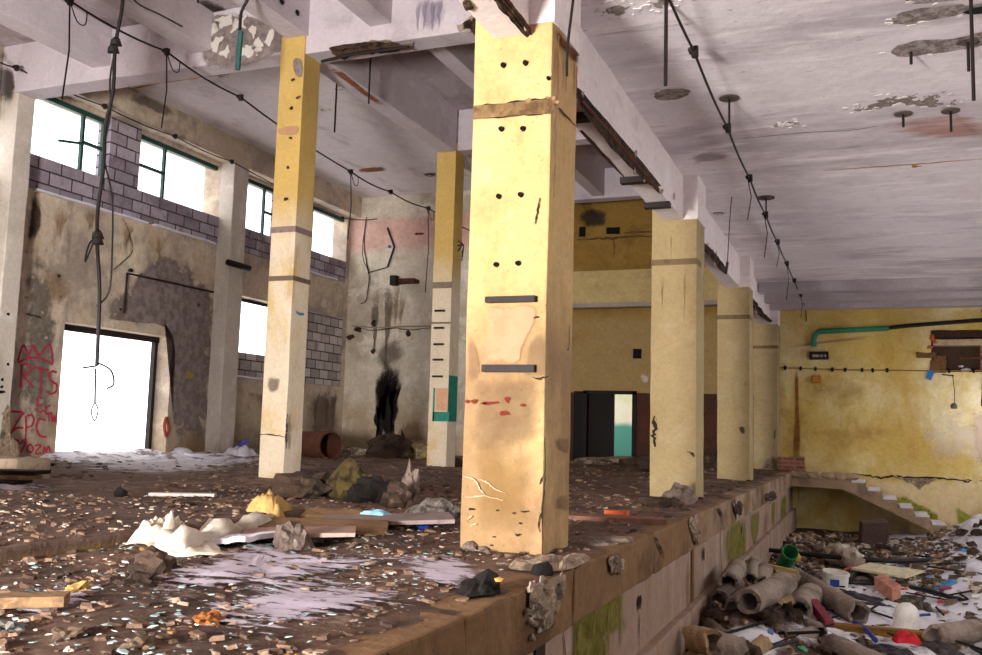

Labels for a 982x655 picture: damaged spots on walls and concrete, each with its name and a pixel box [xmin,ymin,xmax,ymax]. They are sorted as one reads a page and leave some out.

spalling [494,0,531,37]
peeling [203,13,283,78]
spalling [321,39,413,63]
peeling [842,91,963,114]
peeling [484,305,535,364]
water stain [374,379,401,437]
crack [853,473,980,483]